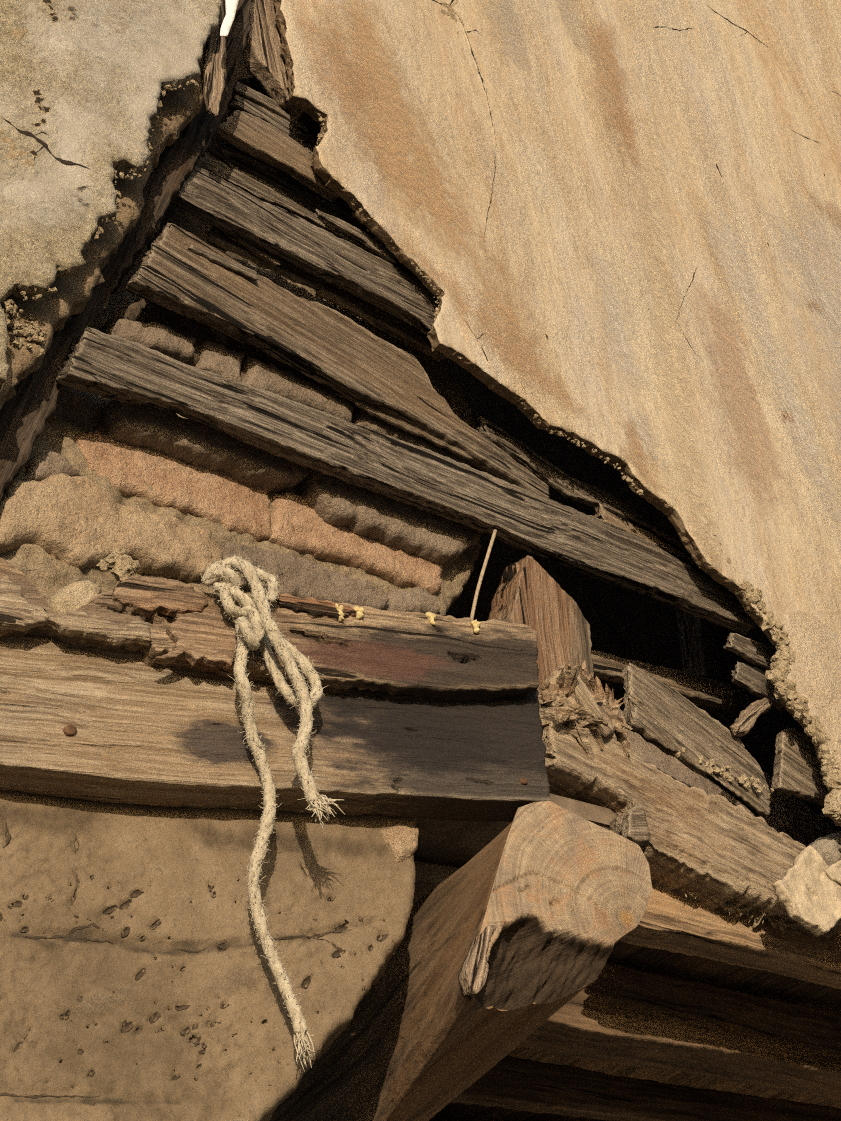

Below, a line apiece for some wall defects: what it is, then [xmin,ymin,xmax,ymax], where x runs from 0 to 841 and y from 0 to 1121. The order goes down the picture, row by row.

spalling [41,0,130,34]
crack [656,5,768,47]
spalling [30,88,52,127]
crack [5,119,90,169]
spalling [93,79,199,240]
crack [430,0,497,236]
spalling [3,256,84,364]
spalling [514,396,644,495]
spalling [705,525,841,827]
spalling [102,885,170,941]
spalling [324,919,395,968]
flaking render [772,845,841,936]